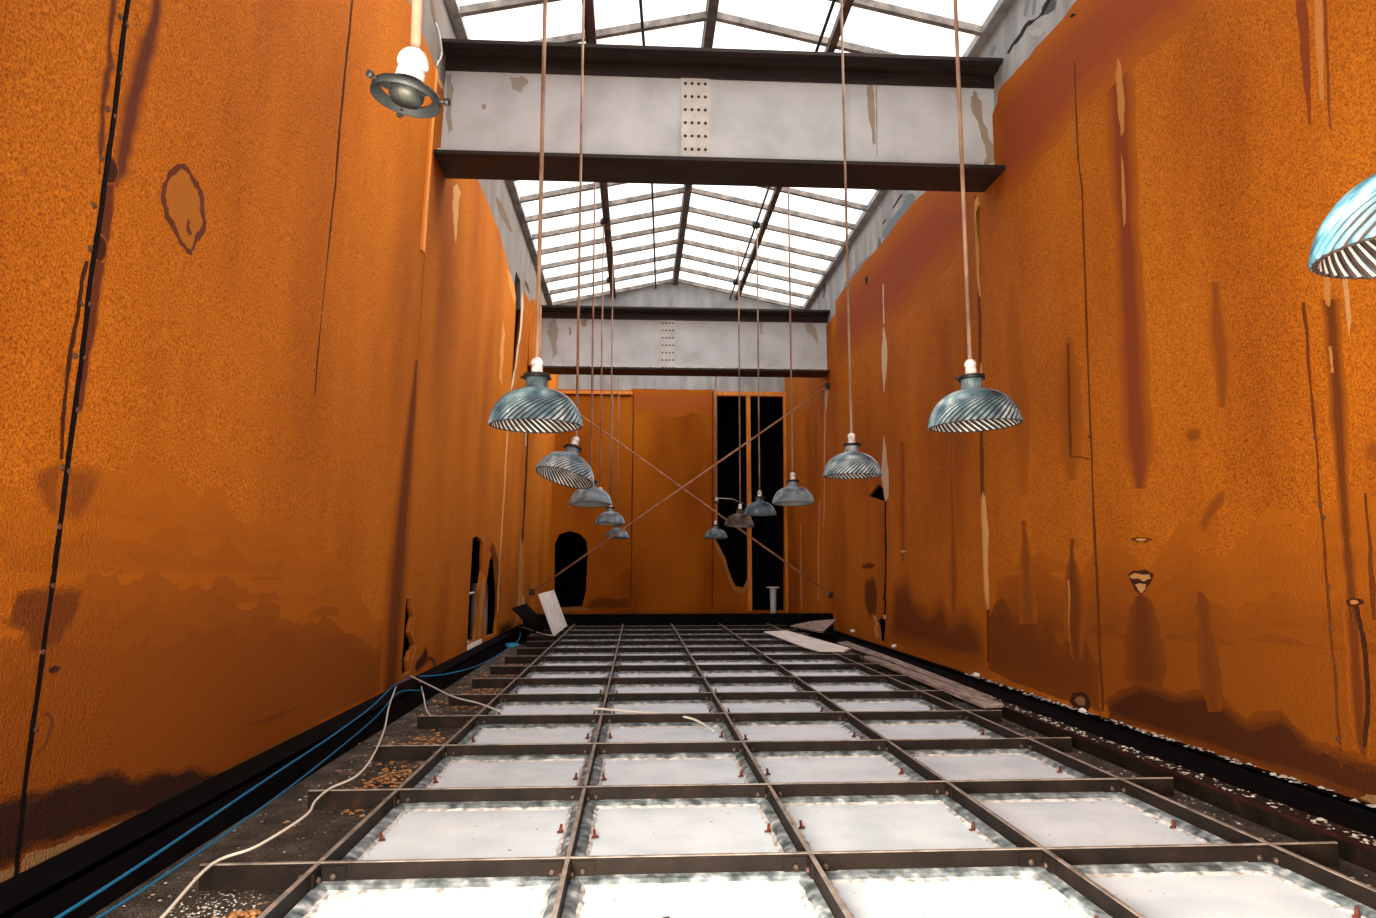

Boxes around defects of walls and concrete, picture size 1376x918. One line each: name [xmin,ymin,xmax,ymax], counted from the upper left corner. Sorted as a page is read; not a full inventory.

damp [78,0,163,414]
damp [161,163,207,256]
damp [0,360,436,874]
damp [862,282,1376,804]
spalling [1128,570,1153,596]